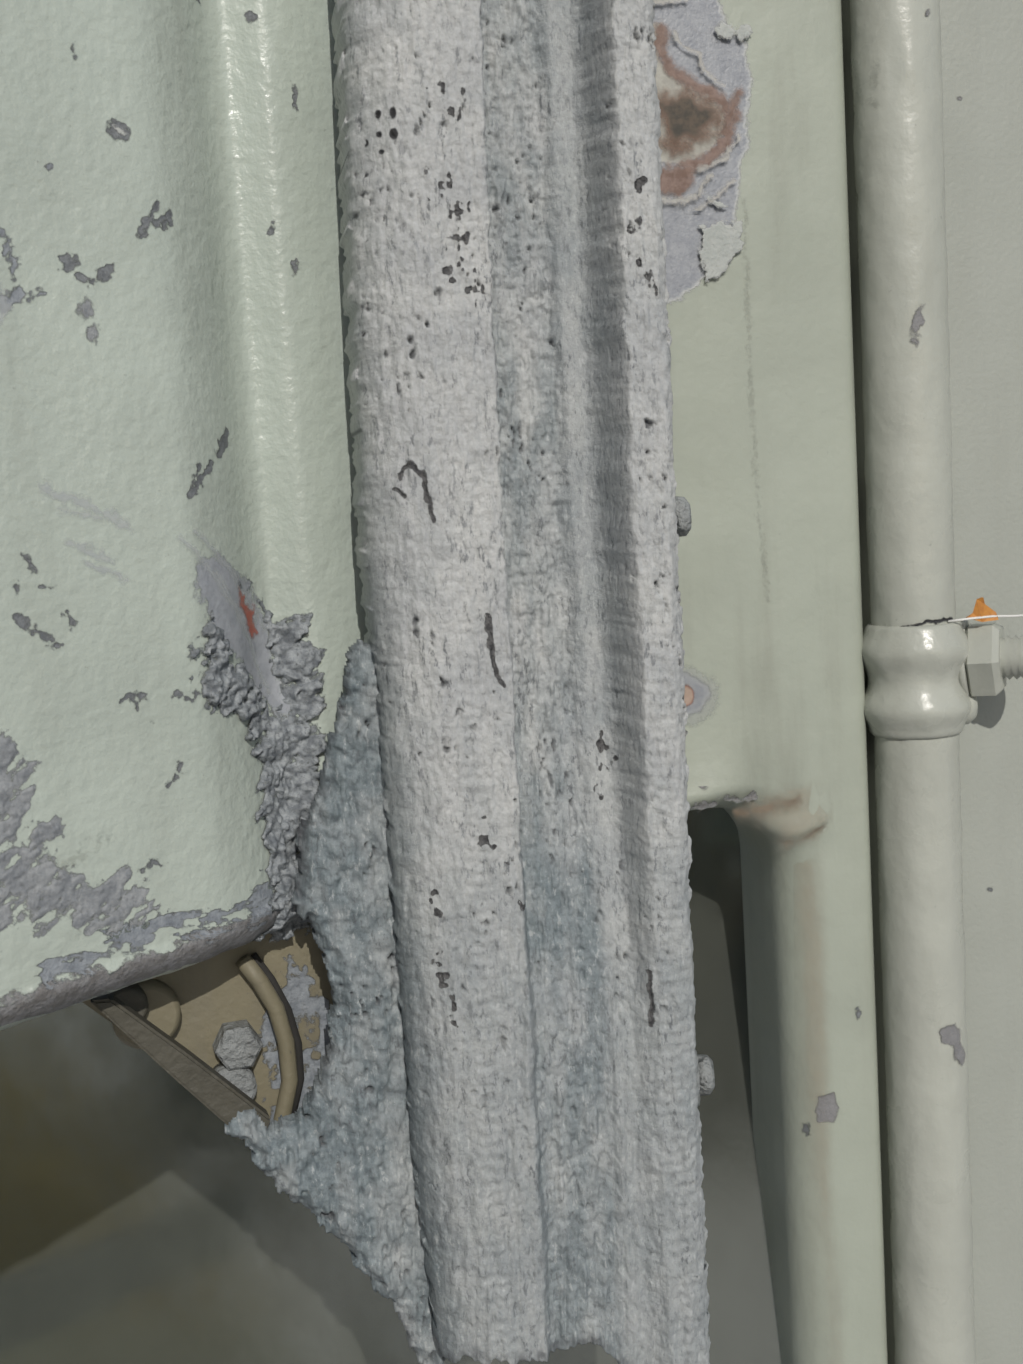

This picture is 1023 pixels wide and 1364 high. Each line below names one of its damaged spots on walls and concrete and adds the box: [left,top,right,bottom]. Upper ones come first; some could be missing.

rust [653,0,753,303]
peeling [0,228,47,321]
rust [683,668,718,726]
peeling [0,531,330,1121]
peeling [940,1025,966,1065]
peeling [802,1092,839,1137]